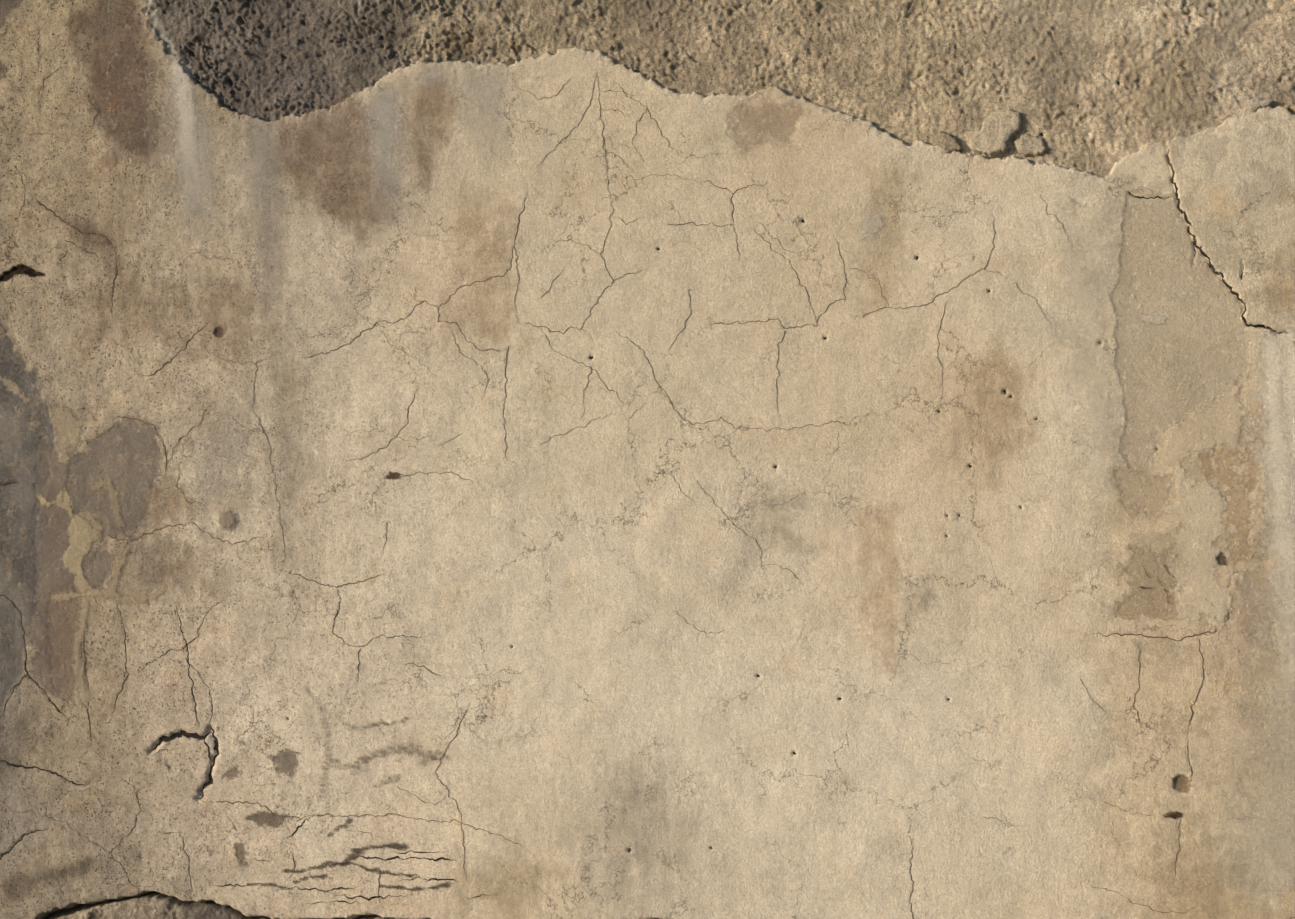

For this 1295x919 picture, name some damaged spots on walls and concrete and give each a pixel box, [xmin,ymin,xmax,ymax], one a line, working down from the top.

peeling [0,0,23,33]
damp [145,0,204,192]
flaking render [134,0,1295,178]
crack [1128,145,1294,338]
crack [105,74,1046,682]
damp [0,321,117,717]
damp [1256,331,1295,765]
crack [0,760,87,786]
crack [0,595,219,740]
crack [212,704,524,875]
crack [1080,577,1231,781]
flaking render [47,891,271,919]